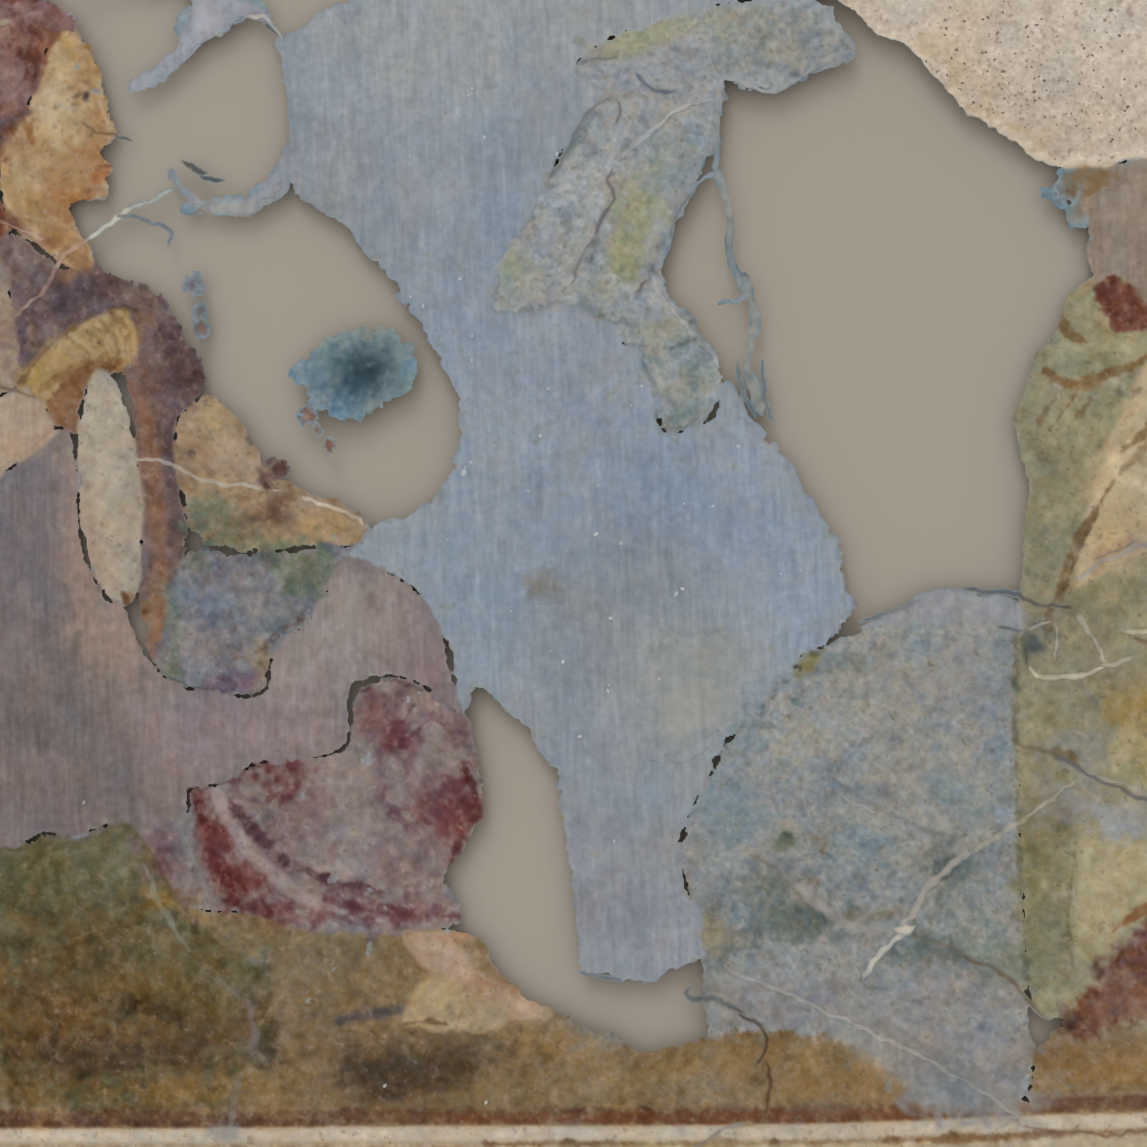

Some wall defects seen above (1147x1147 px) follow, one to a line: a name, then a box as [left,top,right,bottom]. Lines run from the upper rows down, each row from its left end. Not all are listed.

crack [246,13,284,40]
crack [79,120,133,142]
flaking render [838,0,1147,304]
crack [0,159,225,319]
damp [288,338,399,422]
crack [134,456,365,528]
flaking render [0,0,858,984]
crack [859,599,921,623]
flaking render [860,586,1026,631]
crack [963,540,1147,712]
crack [746,735,1147,1020]
crack [684,962,1147,1147]